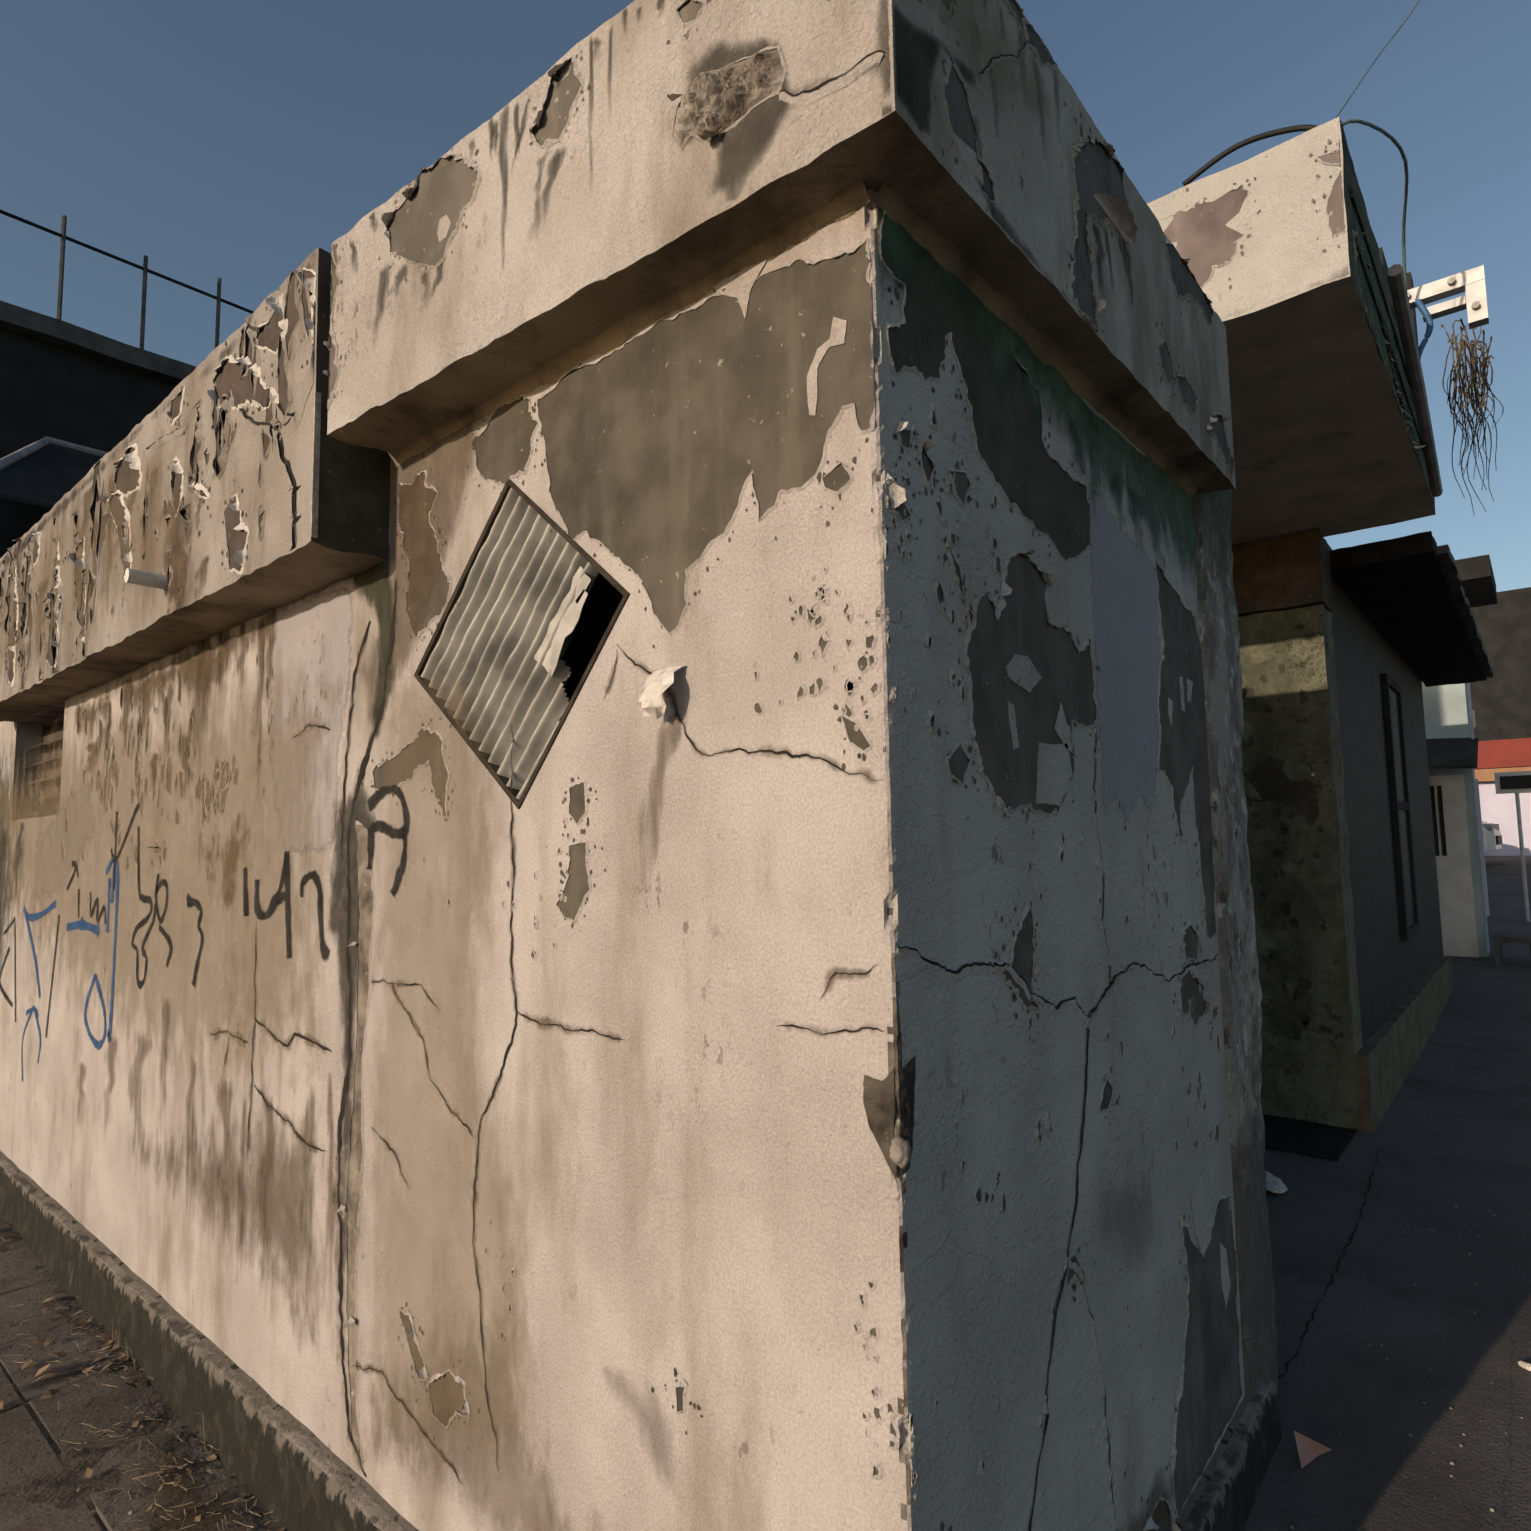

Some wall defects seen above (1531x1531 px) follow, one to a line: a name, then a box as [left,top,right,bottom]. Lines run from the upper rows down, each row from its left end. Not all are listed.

peeling [378,149,482,284]
peeling [1158,177,1261,326]
leakage [0,770,22,943]
spalling [0,244,349,690]
leakage [76,609,276,794]
leakage [330,786,374,1161]
crack [209,580,626,1485]
peeling [530,777,605,962]
crack [604,644,876,781]
flaking render [465,210,1100,876]
crack [776,725,1220,1531]
flaking render [1154,559,1223,1054]